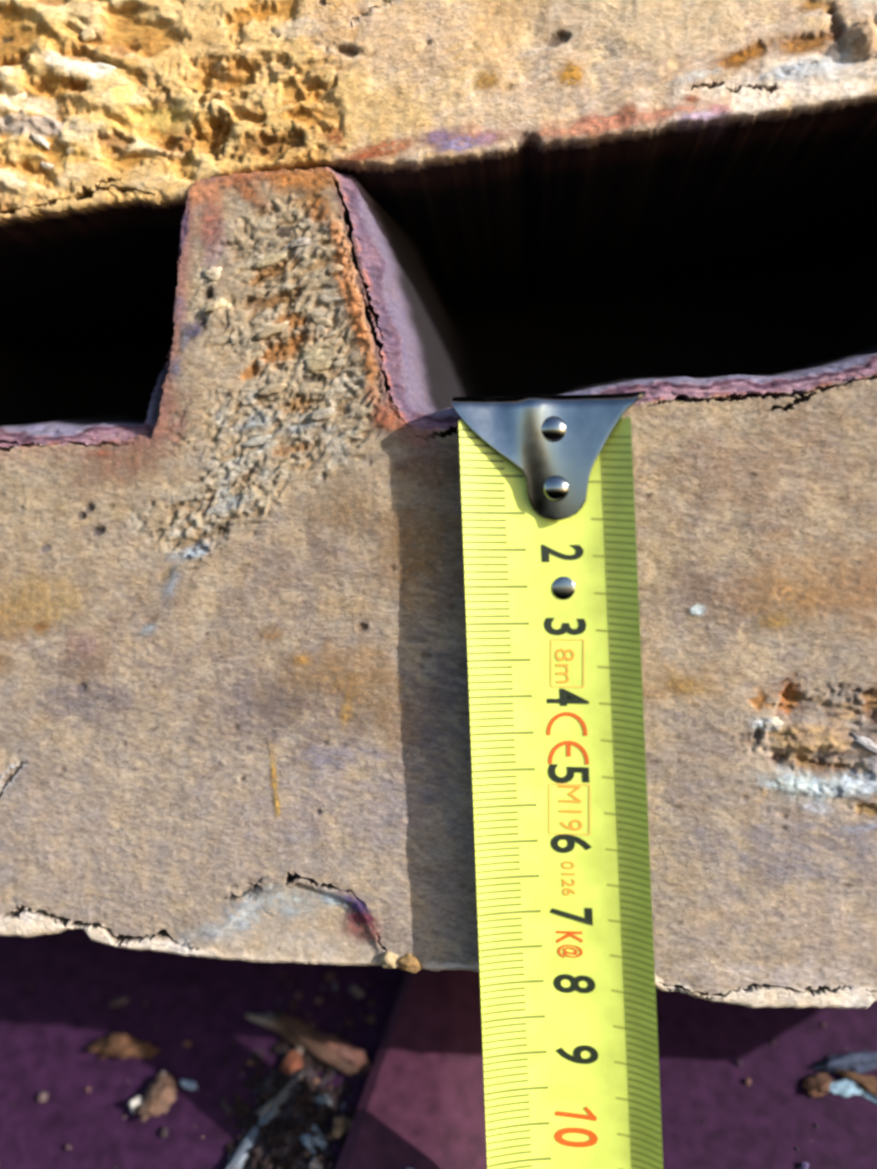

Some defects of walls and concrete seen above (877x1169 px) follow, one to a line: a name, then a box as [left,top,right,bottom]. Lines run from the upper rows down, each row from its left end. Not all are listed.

crack [303,0,409,35]
spalling [0,0,363,204]
spalling [131,177,390,583]
spalling [75,503,105,536]
crack [0,754,34,805]
spalling [721,674,877,817]
crack [0,899,205,956]
crack [215,868,391,955]